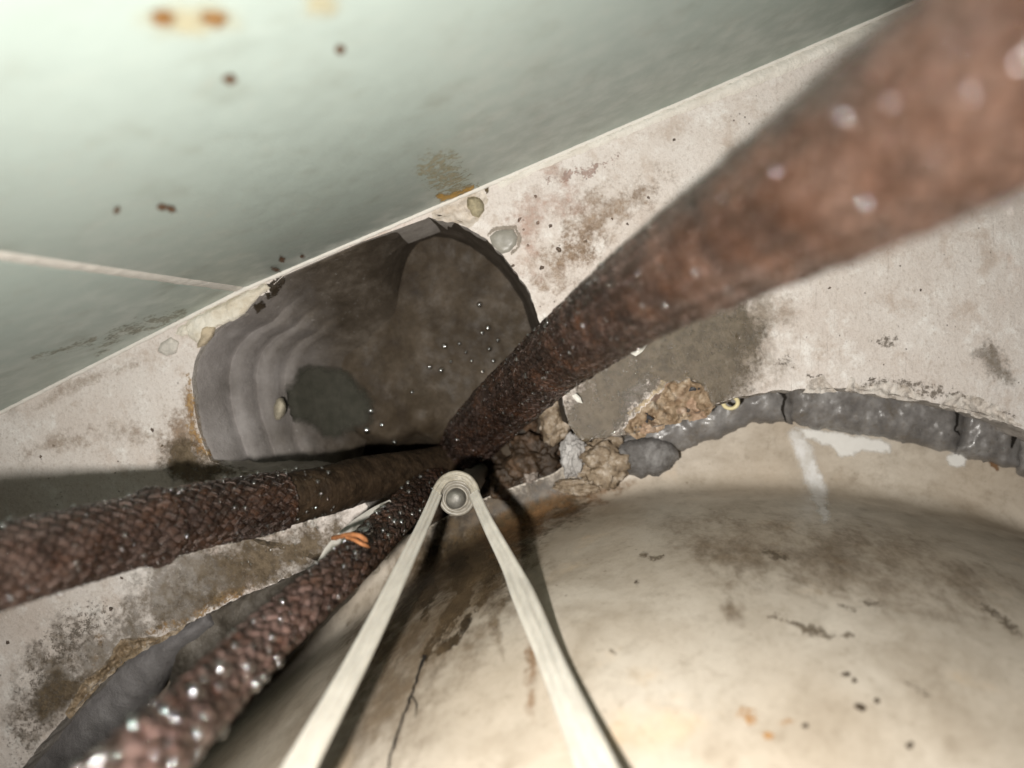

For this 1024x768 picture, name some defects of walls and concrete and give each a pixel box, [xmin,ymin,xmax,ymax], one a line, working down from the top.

rust [152,10,176,25]
rust [201,12,227,28]
rust [546,155,619,182]
rust [437,186,474,201]
rust [546,188,646,279]
water stain [7,519,344,765]
crack [388,655,426,768]